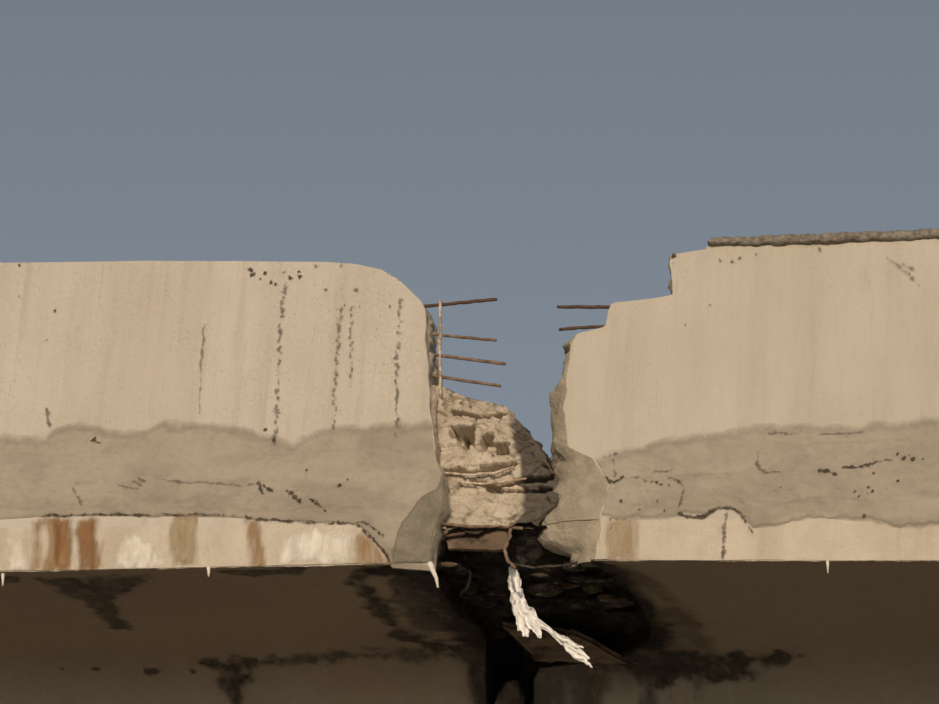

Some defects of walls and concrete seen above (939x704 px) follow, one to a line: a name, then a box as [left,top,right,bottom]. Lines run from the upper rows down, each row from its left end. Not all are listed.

spalling [423,298,635,609]
rust [36,519,100,570]
water stain [0,521,164,630]
rust [170,515,197,562]
rust [248,522,264,565]
water stain [190,562,486,704]
water stain [534,663,607,704]
water stain [622,602,801,704]